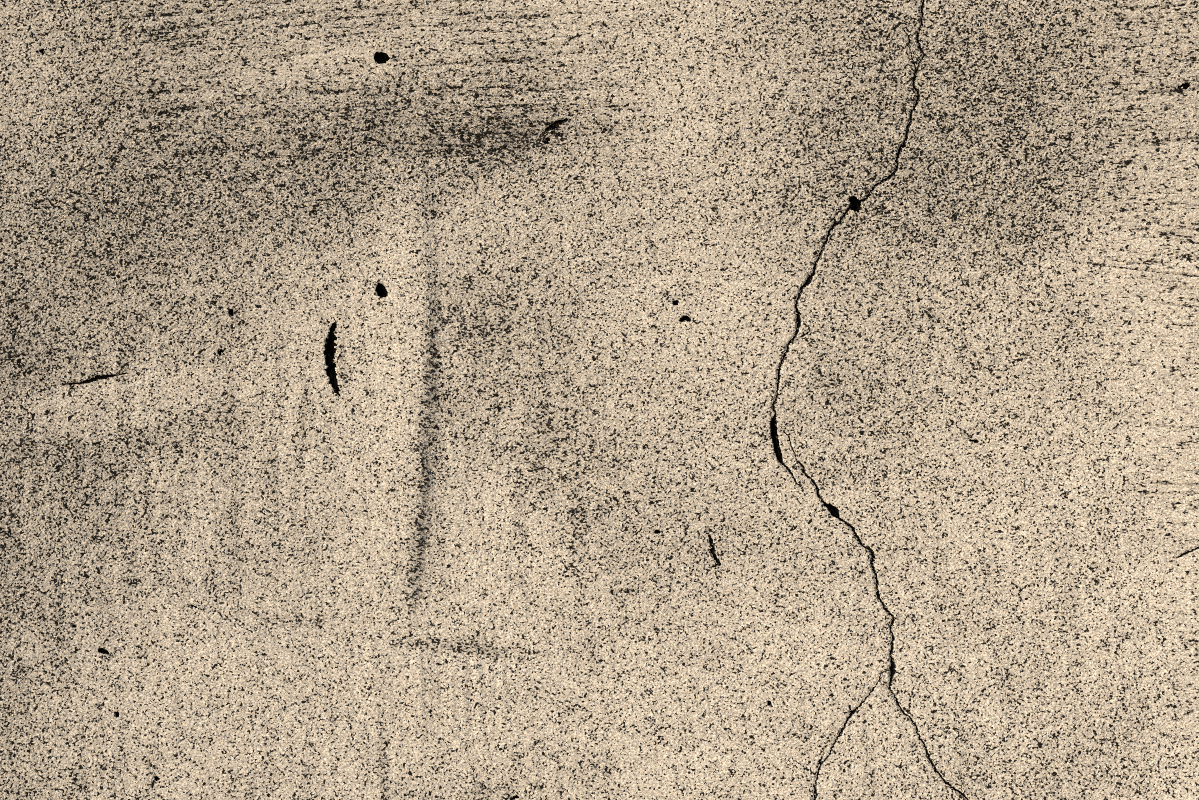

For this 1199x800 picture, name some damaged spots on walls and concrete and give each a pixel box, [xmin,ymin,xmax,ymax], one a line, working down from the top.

crack [772,0,968,800]